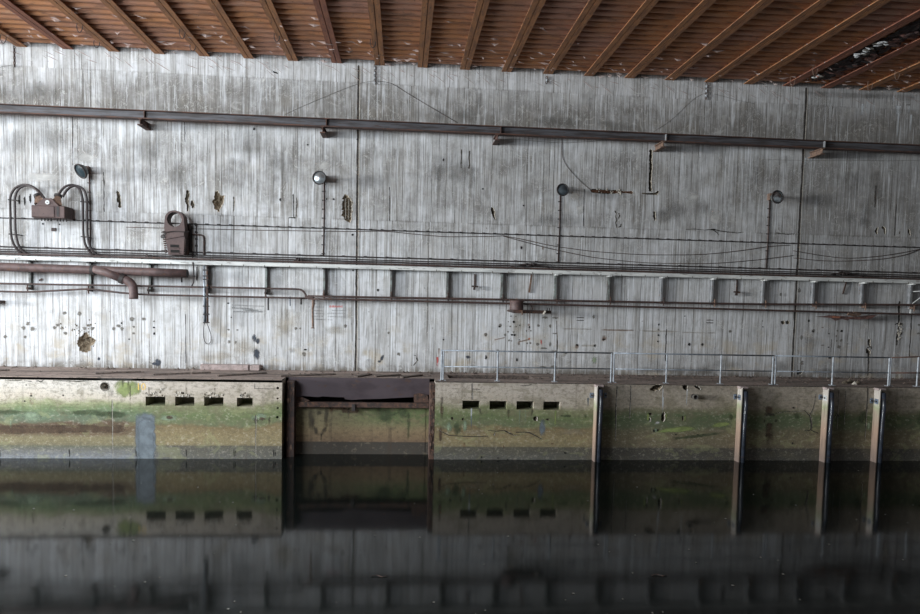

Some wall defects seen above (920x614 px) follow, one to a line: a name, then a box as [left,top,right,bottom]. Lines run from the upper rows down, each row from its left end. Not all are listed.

peeling [854,41,889,58]
spalling [212,190,225,212]
spalling [326,194,355,223]
spalling [53,311,96,353]
leakage [0,410,124,434]
leakage [135,413,175,459]